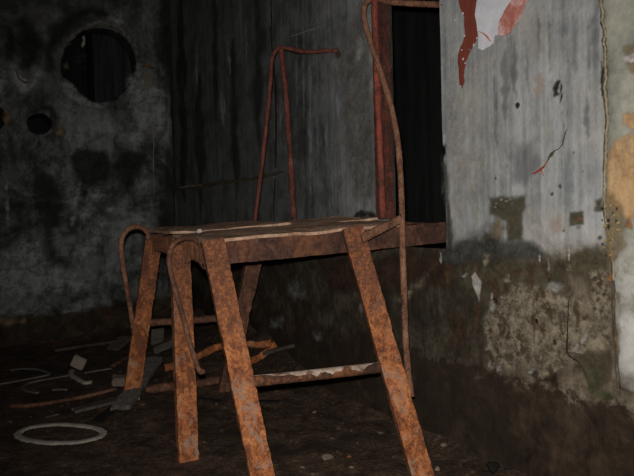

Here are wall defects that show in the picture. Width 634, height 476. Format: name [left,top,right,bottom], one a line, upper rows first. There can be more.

peeling [458,0,527,88]
crack [532,129,567,176]
peeling [598,114,634,259]
leakage [568,247,607,277]
spalling [484,269,611,379]
crack [566,300,595,377]
leakage [574,353,611,389]